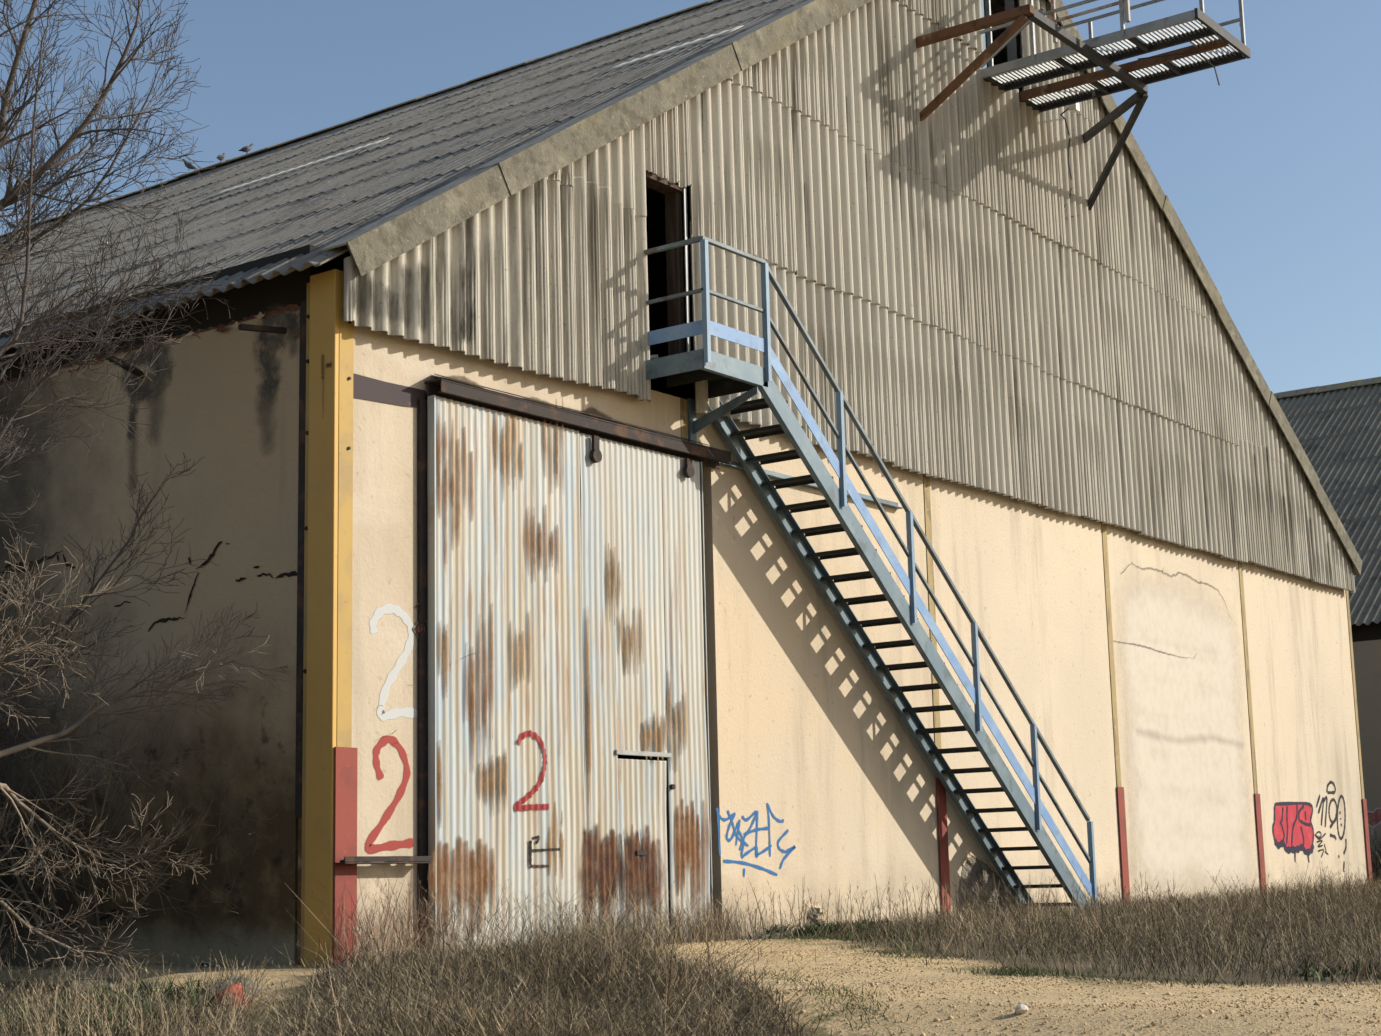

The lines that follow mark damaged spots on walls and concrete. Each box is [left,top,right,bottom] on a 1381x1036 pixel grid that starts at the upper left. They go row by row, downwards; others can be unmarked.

water stain [258,306,299,439]
corrosion [526,398,564,582]
crack [0,550,91,594]
crack [114,541,297,632]
corrosion [607,543,644,673]
corrosion [581,613,712,941]
corrosion [430,838,495,936]
corrosion [548,808,563,878]